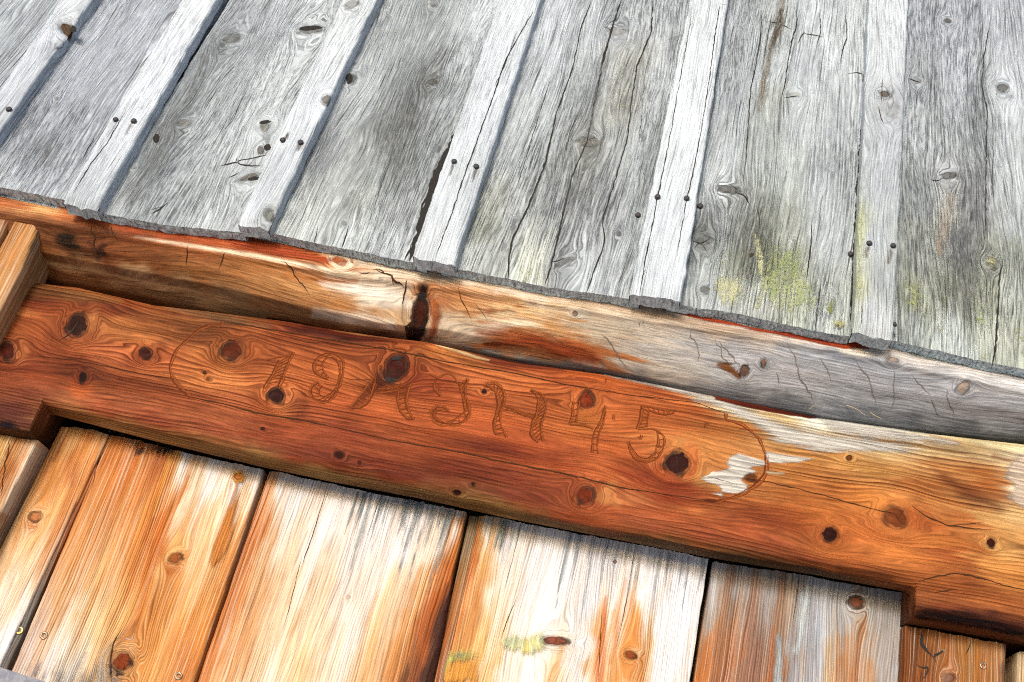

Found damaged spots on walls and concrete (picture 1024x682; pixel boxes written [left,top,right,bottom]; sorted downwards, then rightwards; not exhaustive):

crack [508,0,621,283]
crack [587,2,653,290]
crack [760,480,995,530]